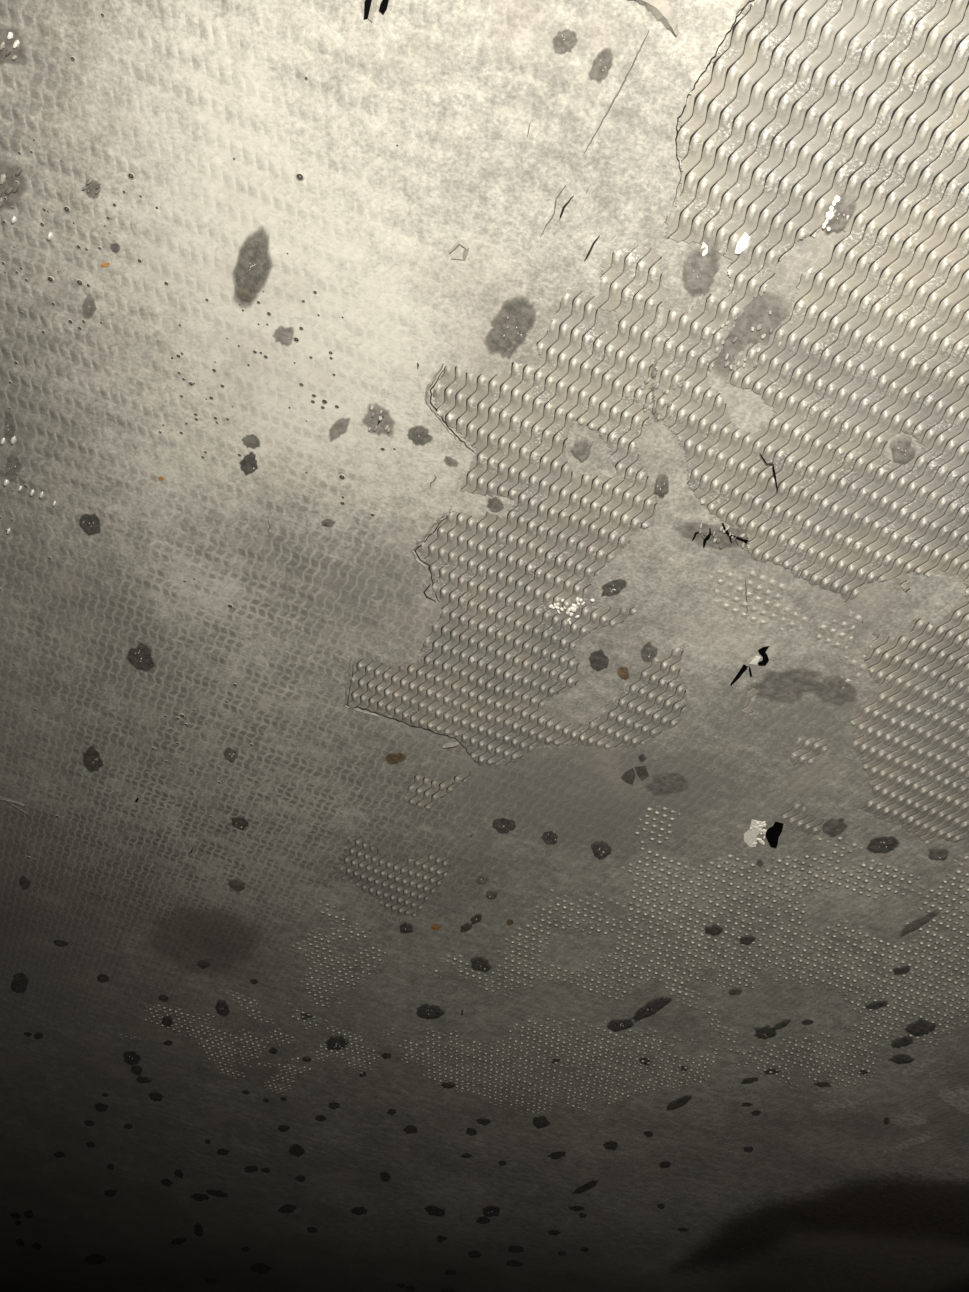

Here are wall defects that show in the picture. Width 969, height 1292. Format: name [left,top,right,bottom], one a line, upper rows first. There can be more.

spalling [0,29,26,63]
peeling [673,0,755,203]
spalling [0,164,24,209]
spalling [82,179,100,198]
flaking render [735,232,750,254]
spalling [711,295,787,375]
spalling [364,404,394,435]
peeling [425,364,474,452]
spalling [677,523,749,549]
flaking render [549,597,595,625]
flaking render [709,569,867,688]
flaking render [143,805,969,1119]